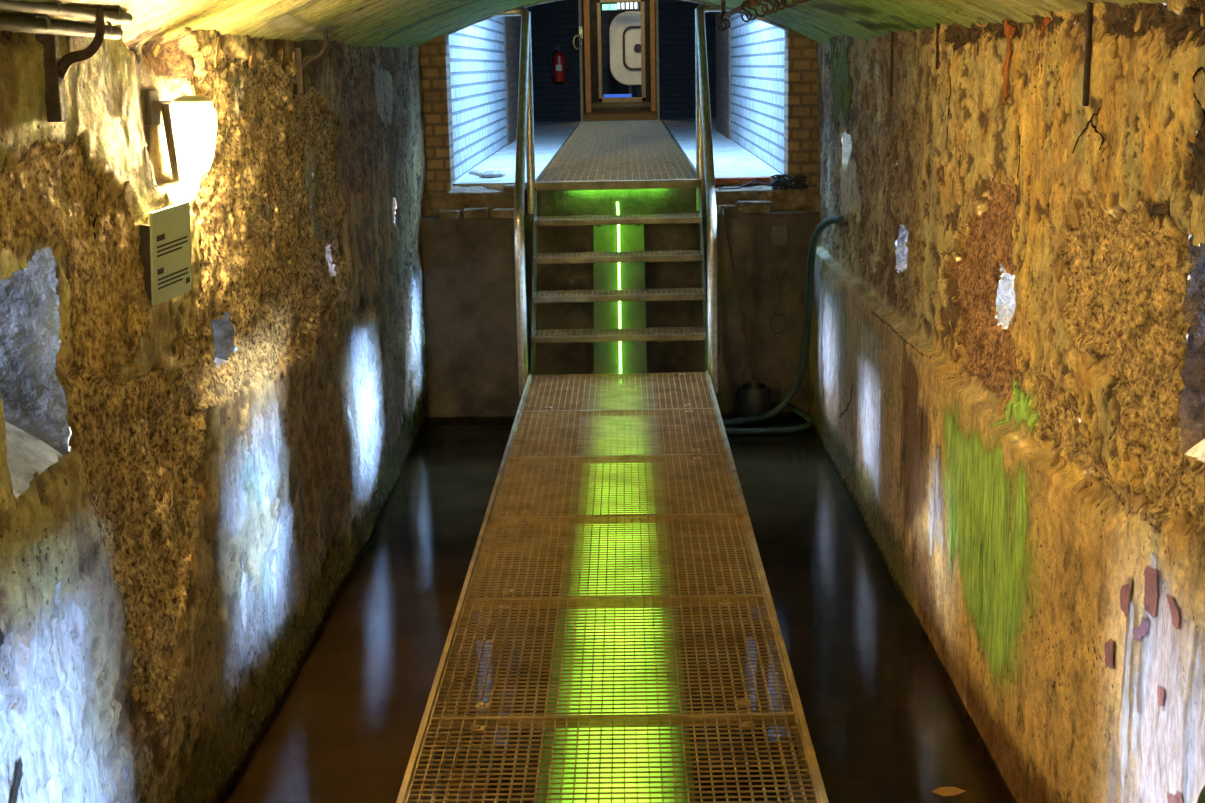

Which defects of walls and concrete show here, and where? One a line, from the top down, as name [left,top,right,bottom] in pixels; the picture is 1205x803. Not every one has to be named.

corrosion [1002,18,1016,105]
crack [1192,67,1205,139]
spalling [1179,125,1205,203]
spalling [0,27,347,735]
spalling [945,168,1205,542]
flaking render [1120,565,1179,640]
flaking render [1105,639,1113,668]
spalling [12,757,23,803]
flaking render [1167,791,1183,803]